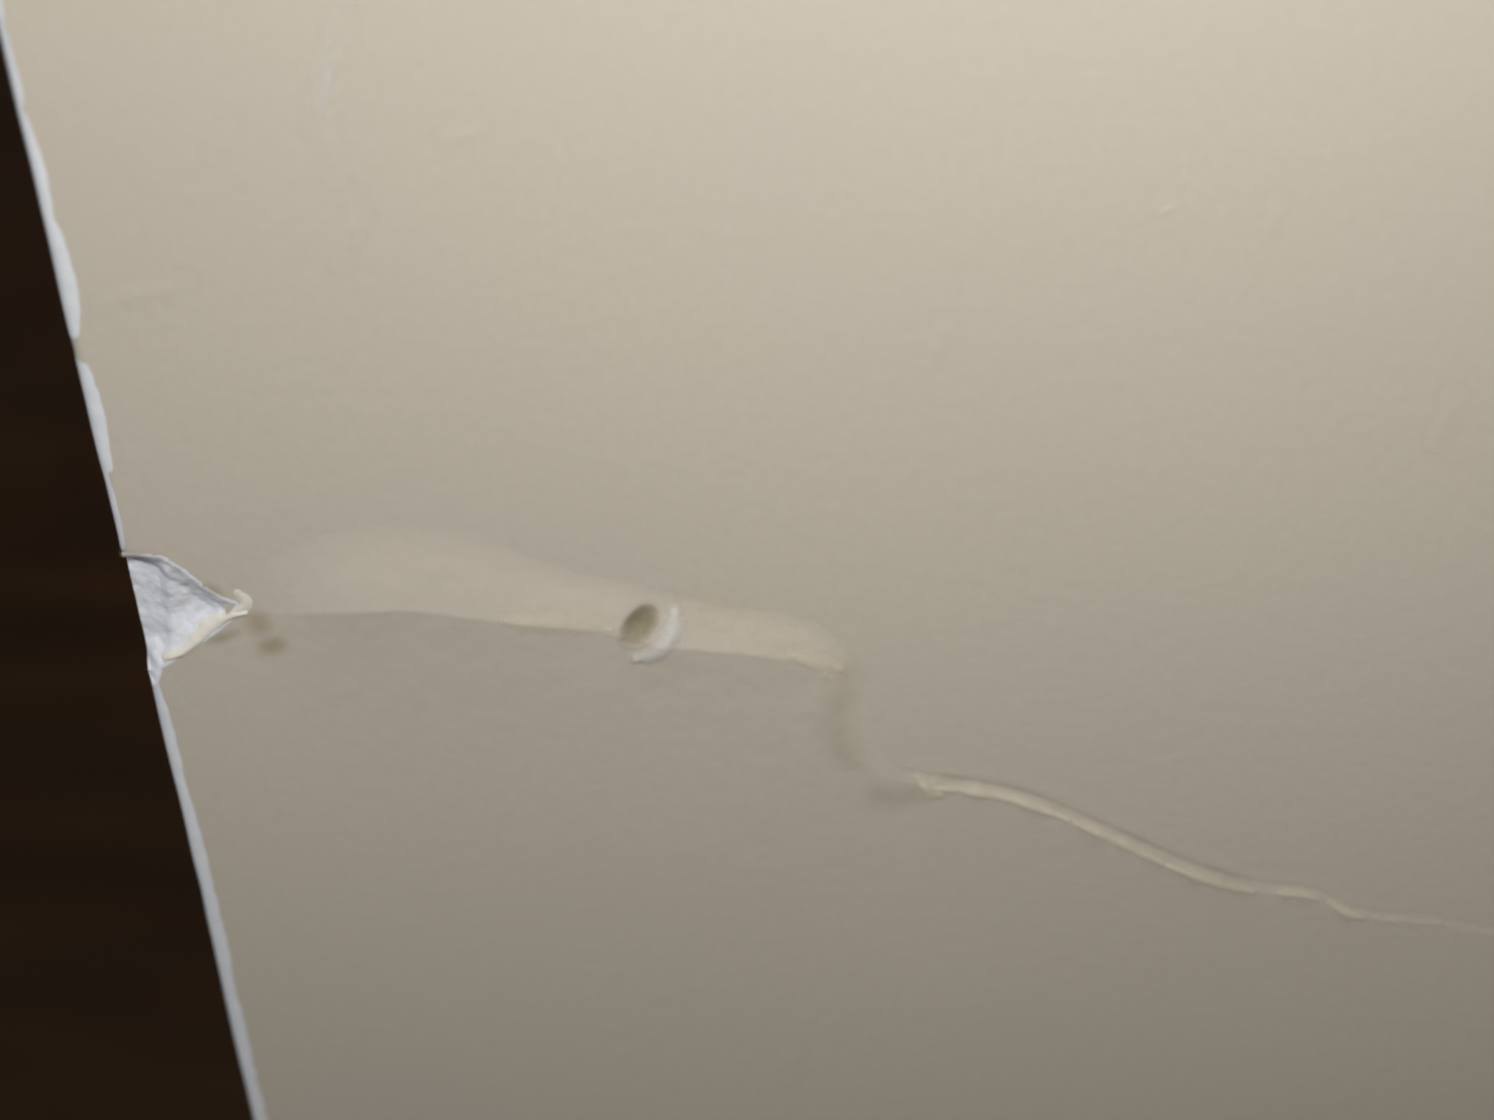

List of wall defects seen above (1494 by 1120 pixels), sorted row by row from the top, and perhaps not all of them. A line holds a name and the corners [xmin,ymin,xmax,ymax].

peeling [0,0,267,1120]
peeling [633,608,680,663]